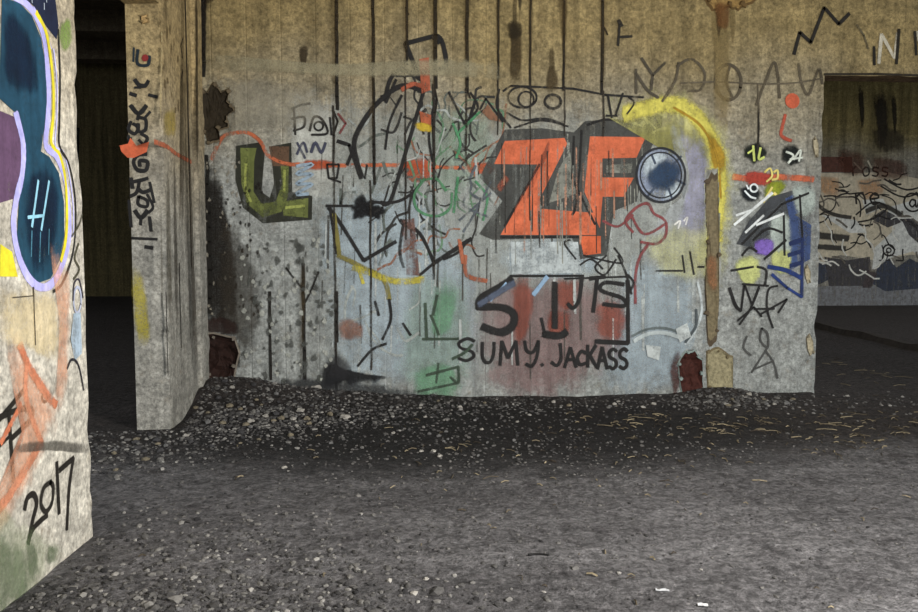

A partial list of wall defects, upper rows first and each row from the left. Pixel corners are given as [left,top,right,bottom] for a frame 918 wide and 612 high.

spalling [705,0,756,28]
leakage [187,0,263,345]
peeling [208,238,337,383]
spalling [632,172,733,392]